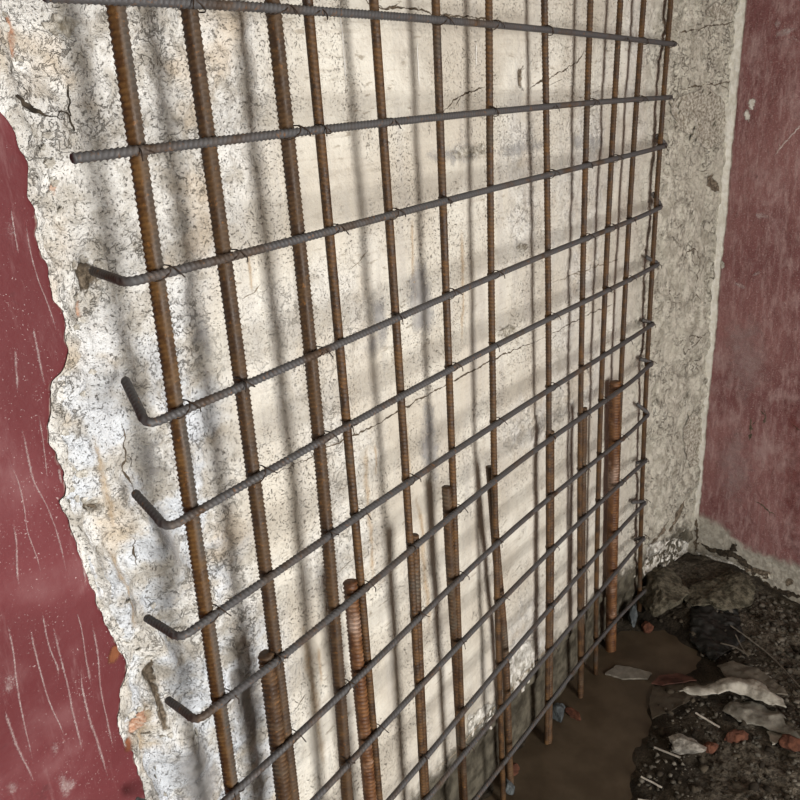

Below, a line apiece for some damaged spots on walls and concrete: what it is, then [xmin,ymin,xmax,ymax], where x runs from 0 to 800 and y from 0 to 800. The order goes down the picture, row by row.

crack [15,85,75,131]
crack [444,87,483,111]
peeling [669,83,727,150]
spalling [705,174,722,195]
flaking render [0,0,167,800]
spalling [42,0,679,800]
crack [269,304,612,479]
spalling [666,500,687,535]
spalling [642,524,689,580]
spalling [698,553,773,581]
peeling [678,677,800,745]